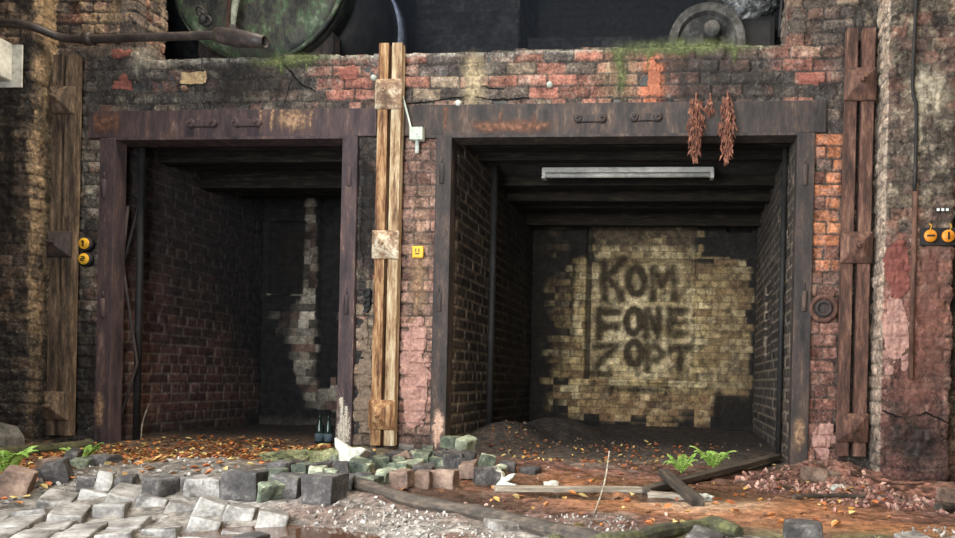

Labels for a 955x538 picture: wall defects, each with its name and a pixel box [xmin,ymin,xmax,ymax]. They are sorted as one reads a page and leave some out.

rust [260,109,313,130]
rust [475,112,547,131]
flaking render [880,239,917,375]